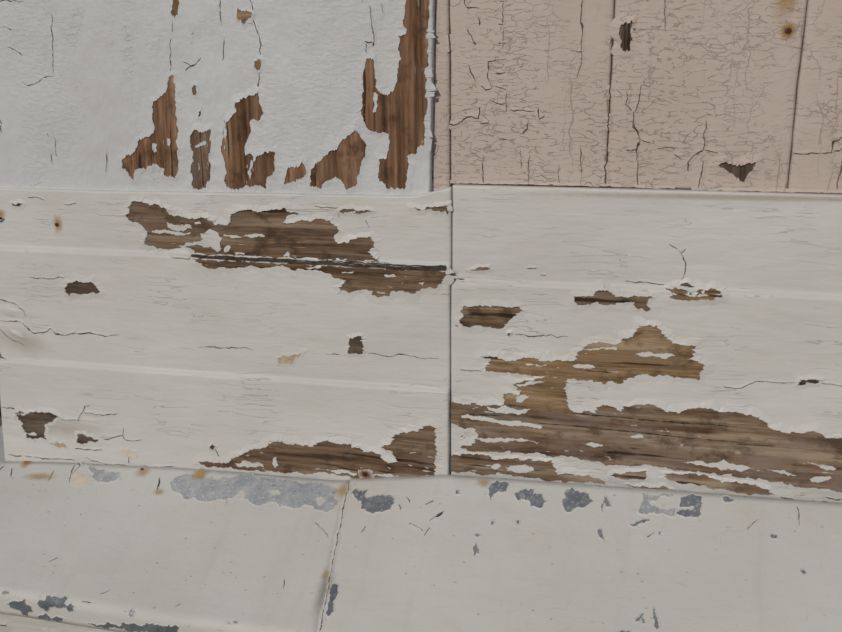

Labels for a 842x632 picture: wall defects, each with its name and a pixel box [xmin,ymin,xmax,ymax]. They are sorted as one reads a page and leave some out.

crack [170,20,201,71]
crack [250,0,264,87]
peeling [610,13,643,60]
crack [432,0,842,194]
peeling [115,0,455,305]
peeling [708,151,765,189]
peeling [60,272,106,302]
peeling [464,263,494,274]
crack [0,298,119,360]
peeling [11,404,105,450]
peeling [169,278,842,528]
peeling [0,590,180,632]